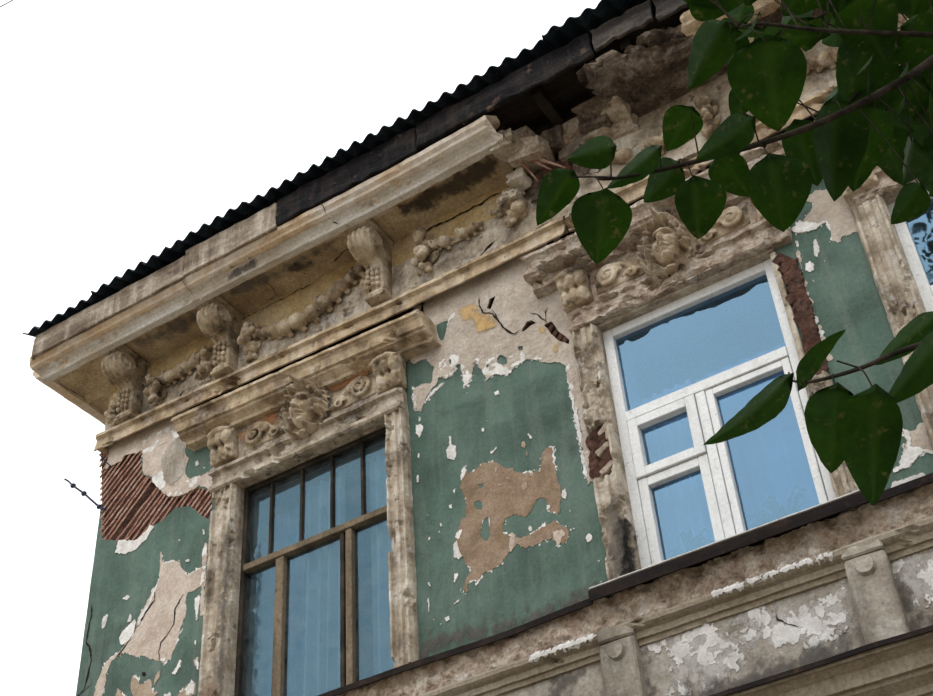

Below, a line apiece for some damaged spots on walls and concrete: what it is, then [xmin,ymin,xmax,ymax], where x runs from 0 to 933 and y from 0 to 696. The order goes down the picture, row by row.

water stain [397,156,497,217]
crack [426,193,499,232]
crack [478,299,547,334]
peeling [772,189,858,355]
peeling [410,258,613,485]
flaking render [816,354,833,375]
peeling [105,408,215,497]
peeling [453,446,575,605]
crack [77,606,92,696]
peeling [94,529,208,696]
peeling [641,581,854,696]
peeling [892,553,933,608]